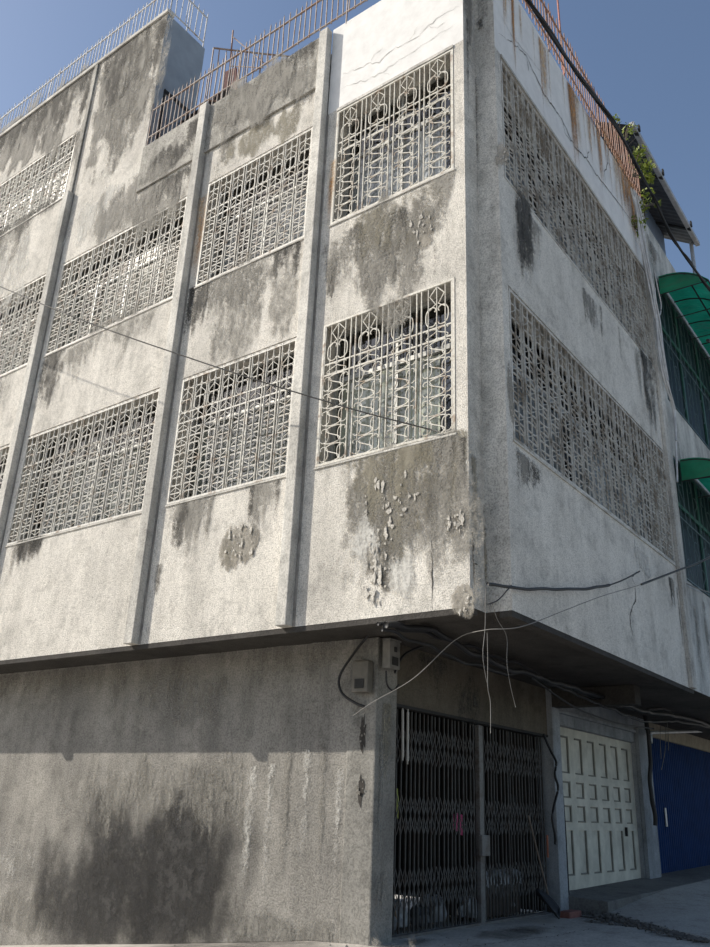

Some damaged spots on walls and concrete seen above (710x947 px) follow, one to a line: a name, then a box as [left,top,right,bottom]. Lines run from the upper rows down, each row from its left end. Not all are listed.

leakage [0,63,93,151]
crack [345,6,459,87]
crack [500,14,633,224]
corrosion [563,83,638,227]
leakage [186,242,301,332]
leakage [323,171,454,309]
leakage [516,191,540,276]
peeling [362,469,431,605]
leakage [345,430,487,597]
spalling [445,509,469,537]
leakage [0,746,338,944]
spalling [356,774,364,807]